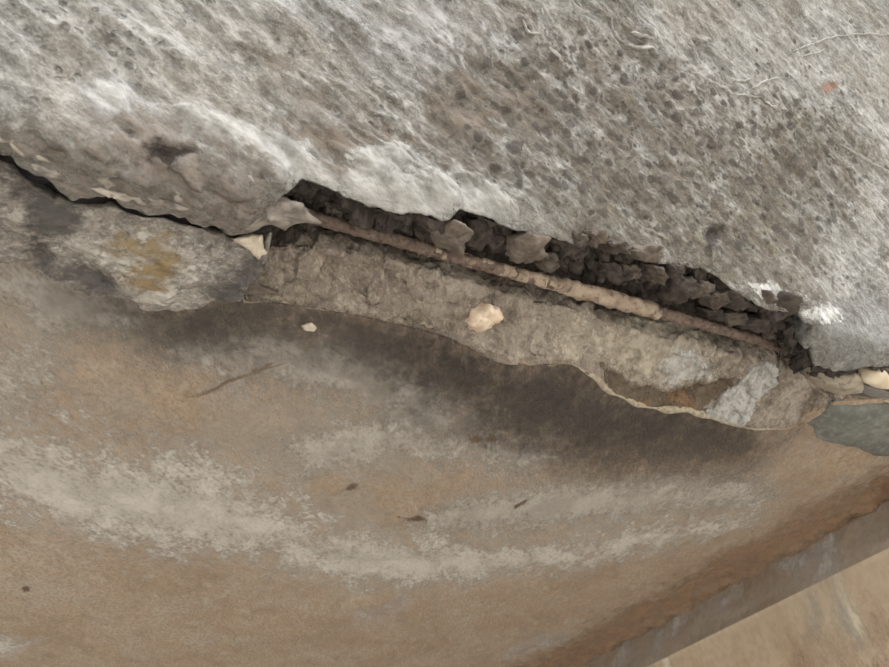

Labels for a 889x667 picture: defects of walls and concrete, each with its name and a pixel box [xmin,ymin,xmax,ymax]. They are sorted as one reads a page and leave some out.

crack [0,154,258,239]
water stain [0,166,783,607]
spalling [466,125,494,156]
spalling [231,180,889,431]
spalling [491,32,861,258]